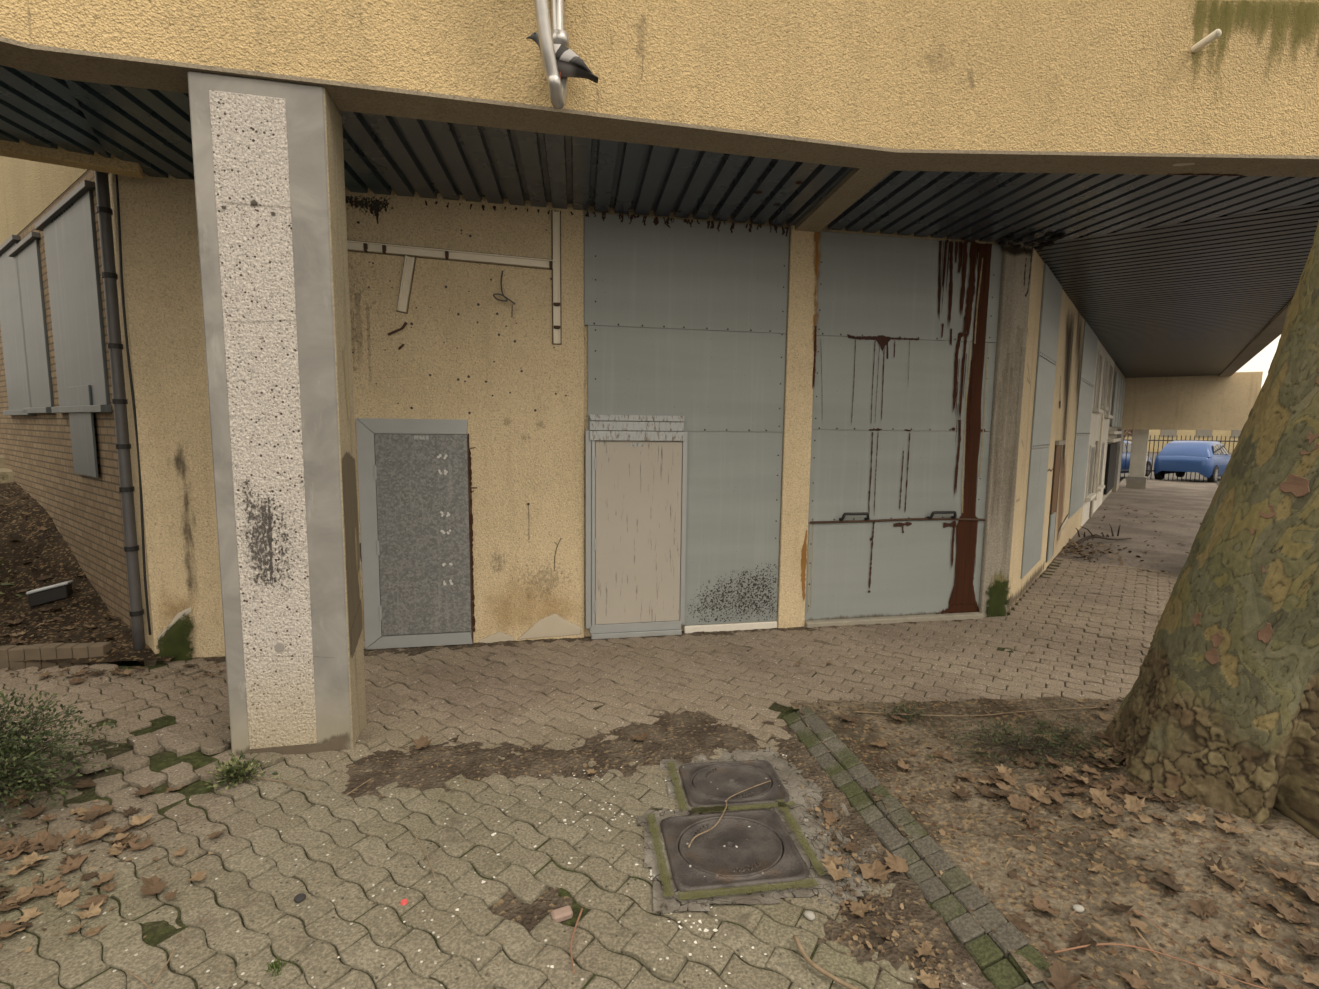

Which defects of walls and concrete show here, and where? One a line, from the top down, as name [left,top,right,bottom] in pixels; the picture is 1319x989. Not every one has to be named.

rust [847,334,919,593]
rust [936,238,992,614]